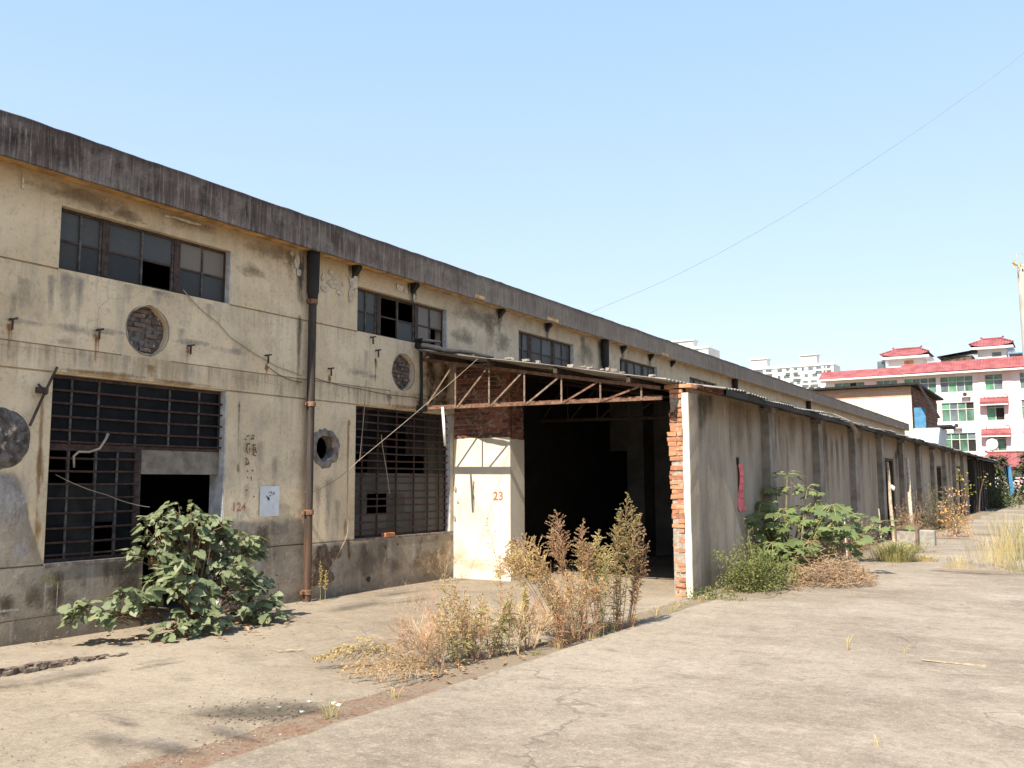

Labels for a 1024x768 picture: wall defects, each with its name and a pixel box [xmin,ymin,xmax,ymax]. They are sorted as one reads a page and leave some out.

peeling [290,251,301,276]